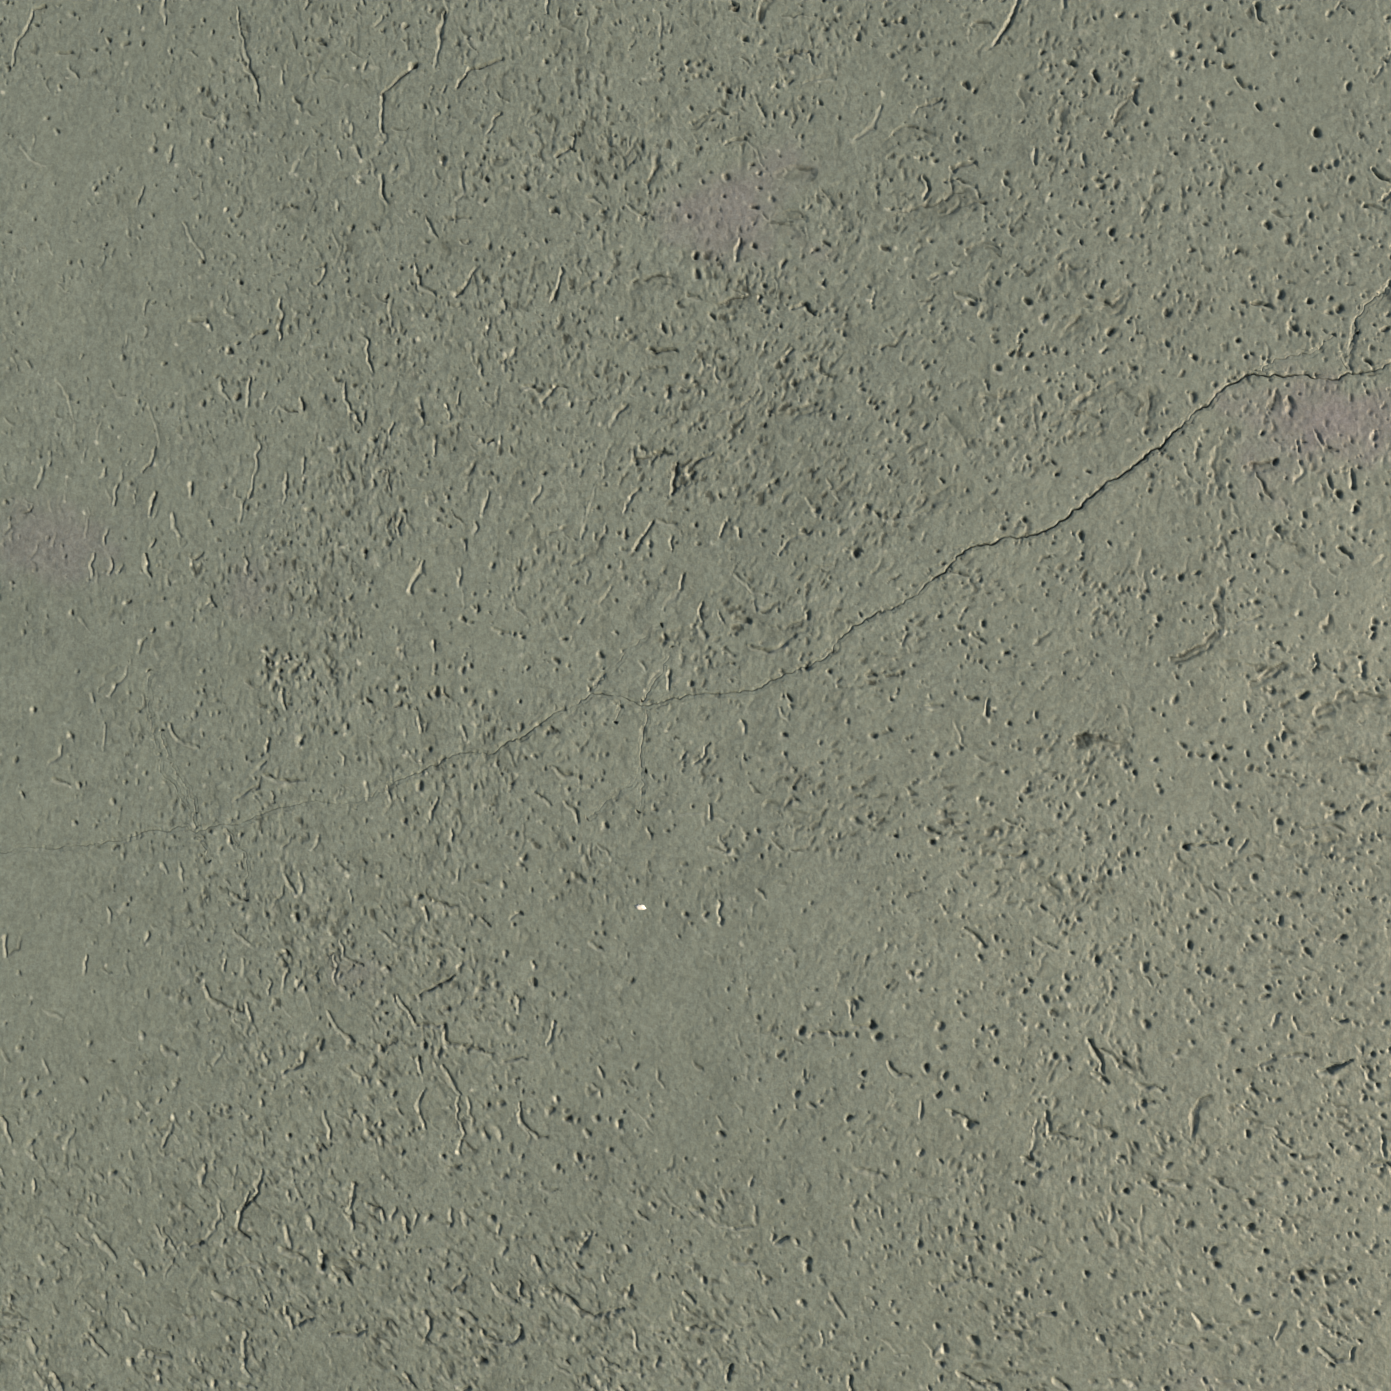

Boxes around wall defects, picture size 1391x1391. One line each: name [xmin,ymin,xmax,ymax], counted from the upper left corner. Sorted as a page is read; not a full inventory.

crack [0,280,1391,900]